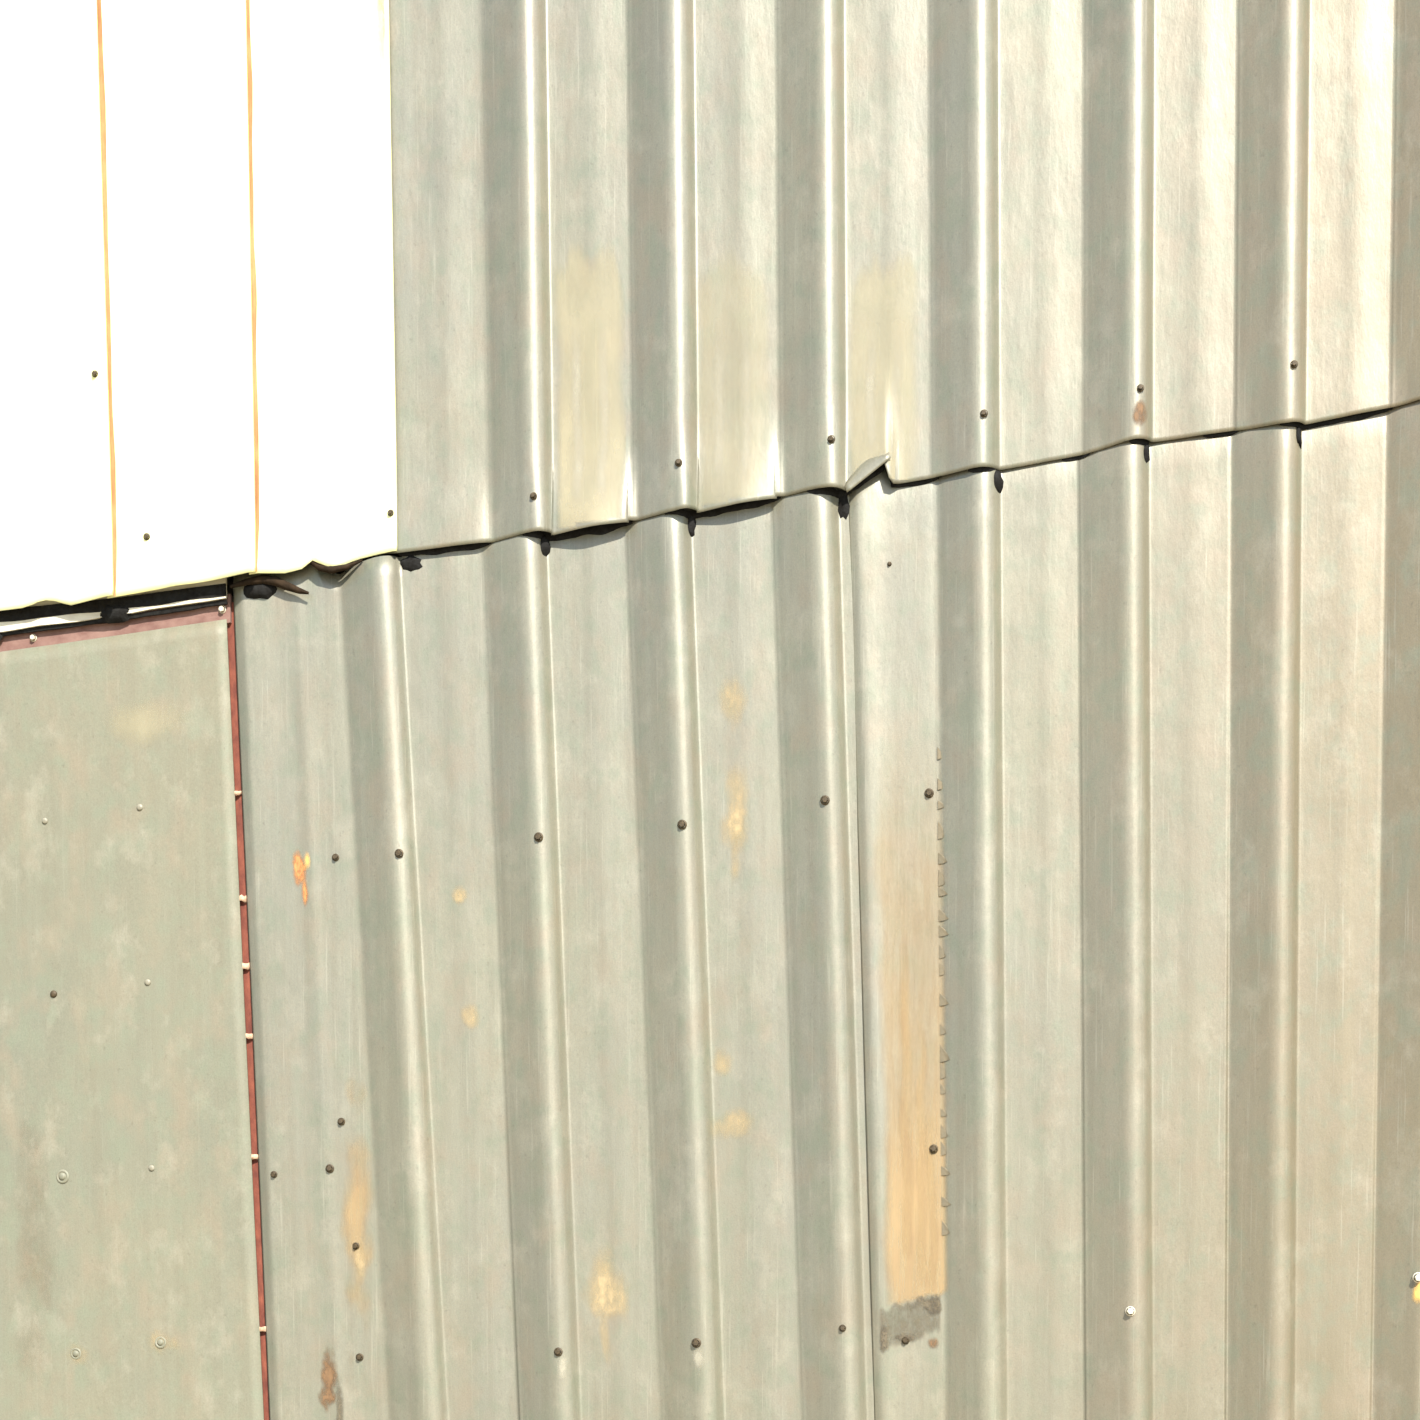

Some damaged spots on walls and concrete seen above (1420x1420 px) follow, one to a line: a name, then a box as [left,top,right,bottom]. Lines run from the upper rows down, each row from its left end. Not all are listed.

rust [293,854,309,903]
rust [888,1074,945,1302]
rust [321,1354,342,1420]